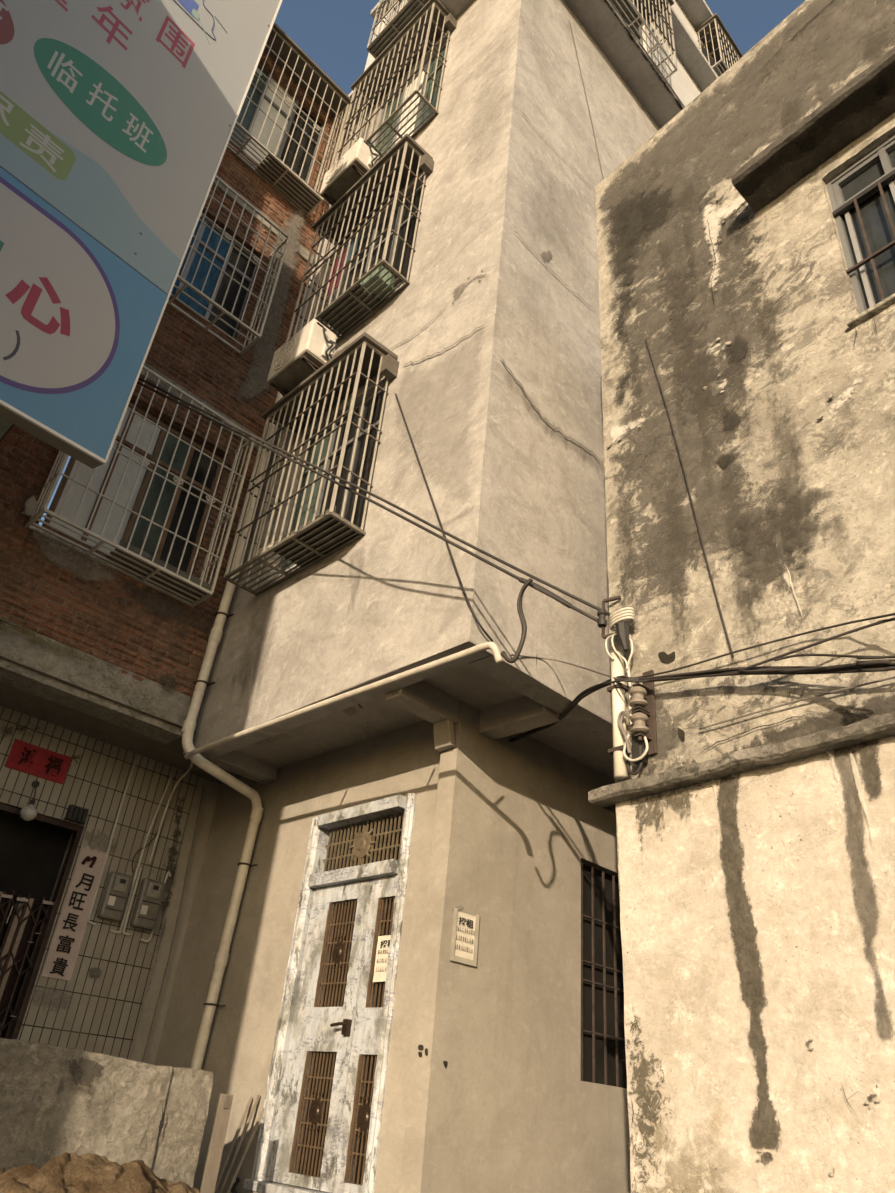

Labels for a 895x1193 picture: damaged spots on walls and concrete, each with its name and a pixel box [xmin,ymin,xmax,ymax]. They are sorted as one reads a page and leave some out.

water stain [599,0,895,431]
water stain [610,416,839,639]
water stain [625,1013,670,1193]
water stain [630,772,781,1151]
water stain [825,739,895,1039]